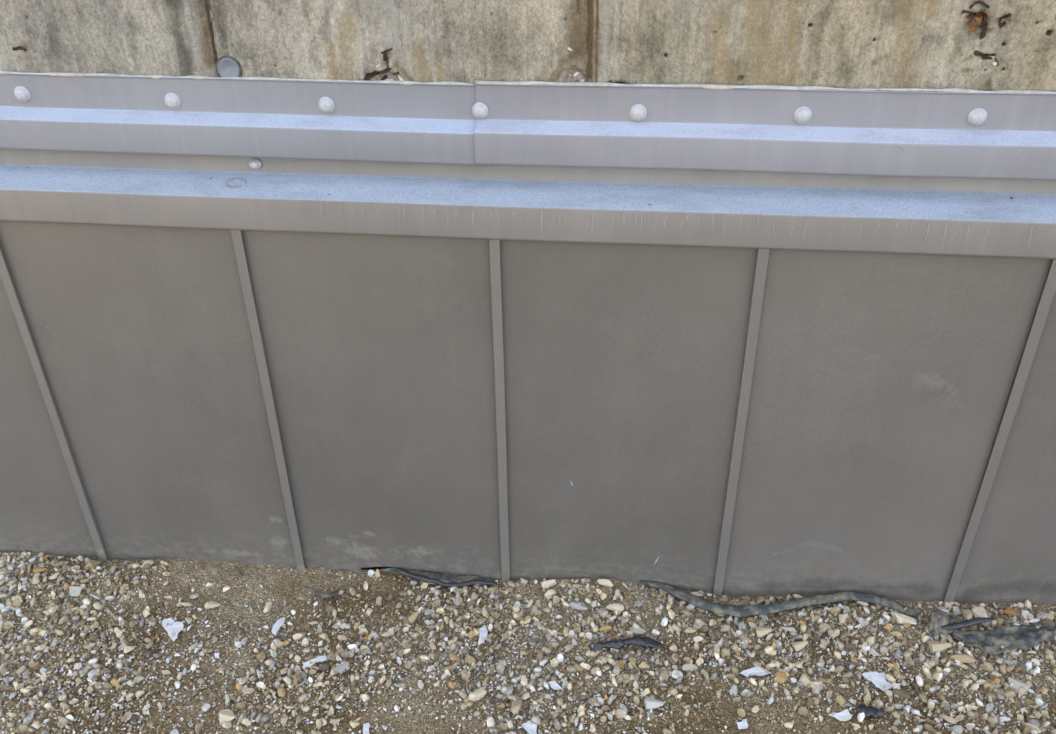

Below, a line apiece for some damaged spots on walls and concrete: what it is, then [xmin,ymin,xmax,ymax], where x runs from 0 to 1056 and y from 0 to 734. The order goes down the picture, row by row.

spalling [359,48,412,81]